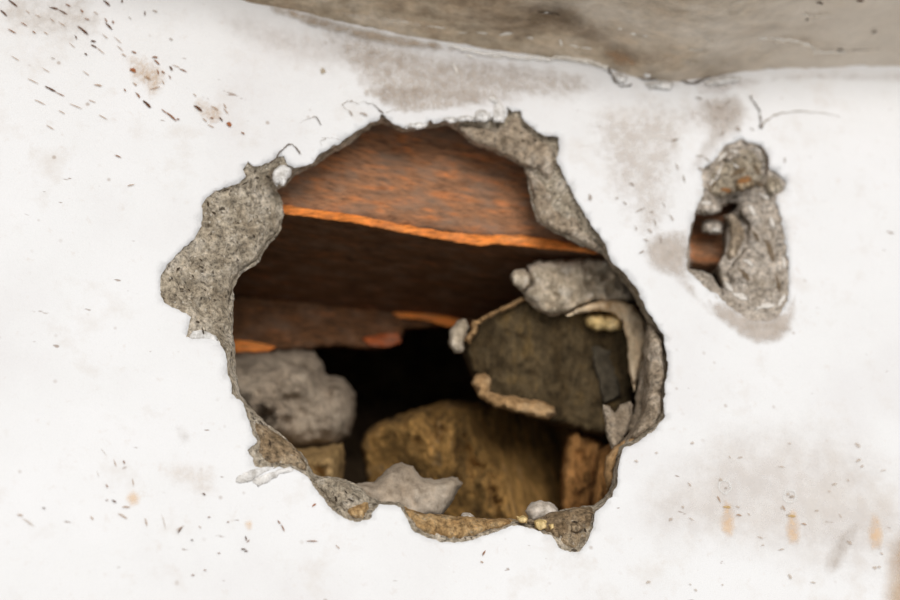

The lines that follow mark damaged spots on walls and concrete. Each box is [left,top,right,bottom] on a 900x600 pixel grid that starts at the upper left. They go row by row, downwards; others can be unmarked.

leakage [289,11,531,109]
crack [745,96,837,172]
leakage [636,198,685,272]
flaking render [686,139,789,322]
flaking render [160,95,668,552]
leakage [715,305,791,341]